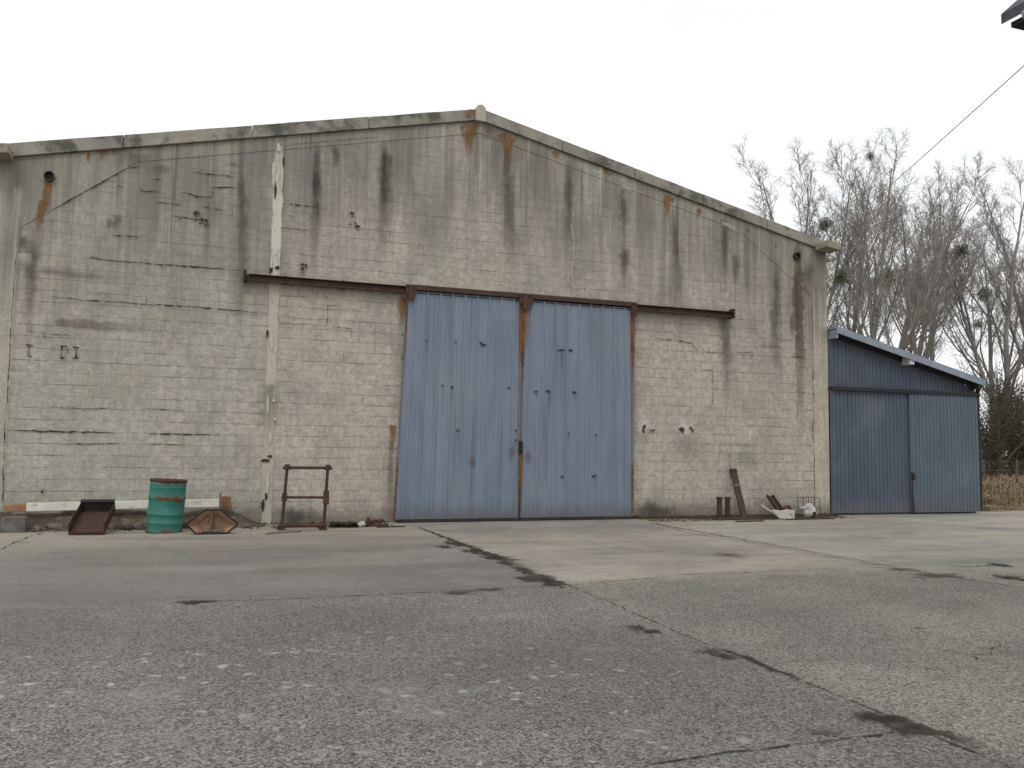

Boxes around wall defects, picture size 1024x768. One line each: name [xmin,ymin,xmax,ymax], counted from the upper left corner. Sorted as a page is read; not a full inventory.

rust [461,109,476,145]
rust [37,181,51,220]
crack [56,163,237,220]
peeling [272,143,284,198]
leakage [382,154,390,195]
leakage [793,252,804,358]